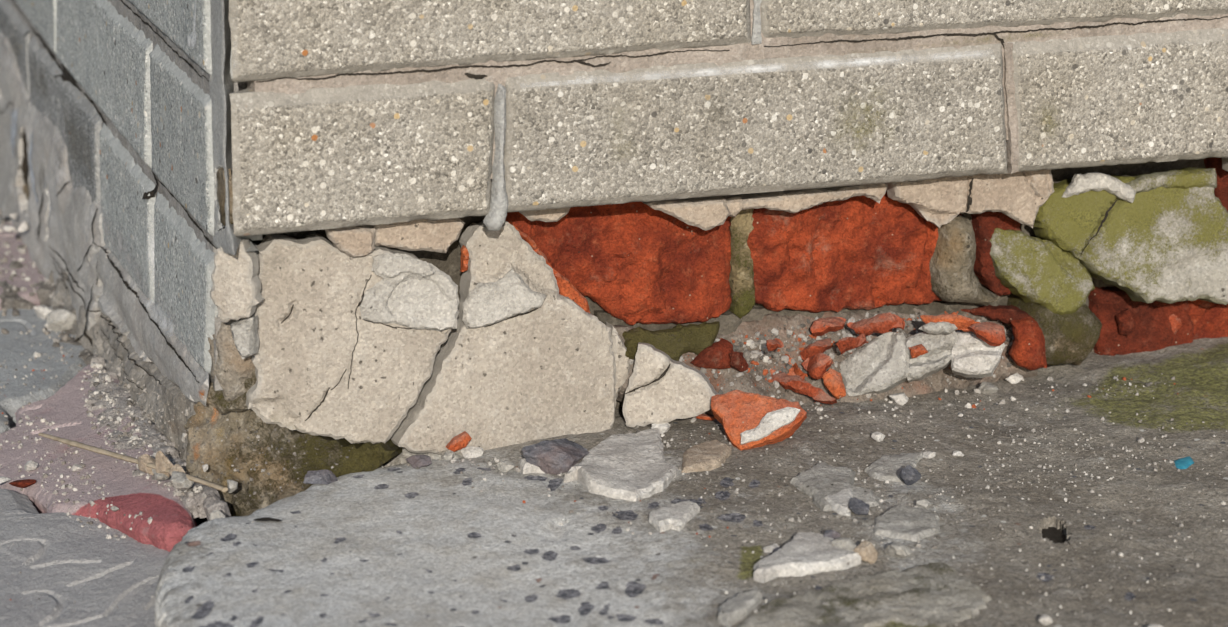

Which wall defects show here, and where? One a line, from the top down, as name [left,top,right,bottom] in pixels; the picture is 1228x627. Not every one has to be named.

spalling [217,168,233,226]
flaking render [520,207,571,222]
flaking render [643,169,1136,231]
crack [1081,199,1119,255]
crack [36,181,199,393]
flaking render [208,239,265,401]
crack [305,276,452,421]
spalling [325,218,547,331]
crack [485,307,540,327]
flaking render [919,322,958,334]